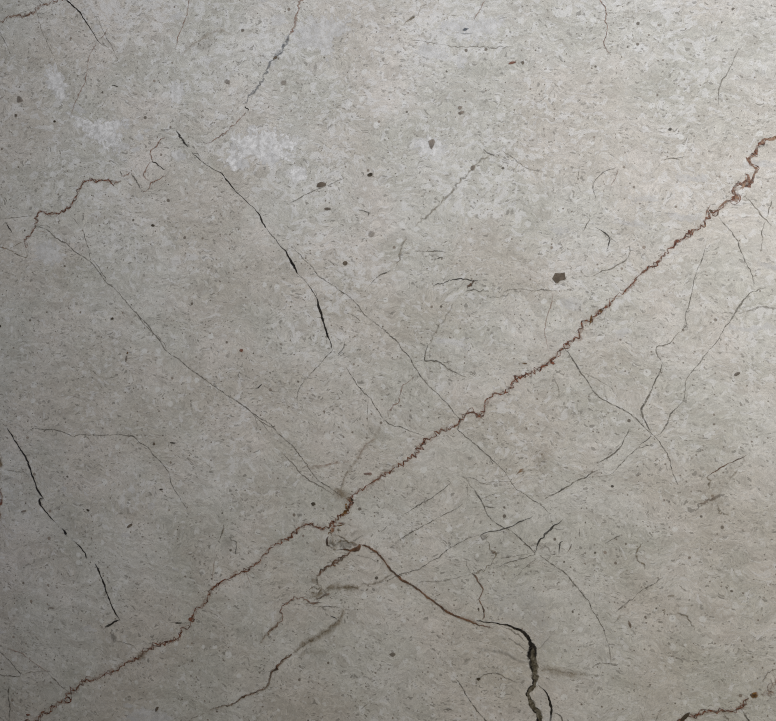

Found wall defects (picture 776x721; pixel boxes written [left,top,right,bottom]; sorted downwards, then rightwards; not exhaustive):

crack [6,0,114,105]
crack [2,178,113,287]
crack [35,129,776,721]
crack [0,428,120,627]